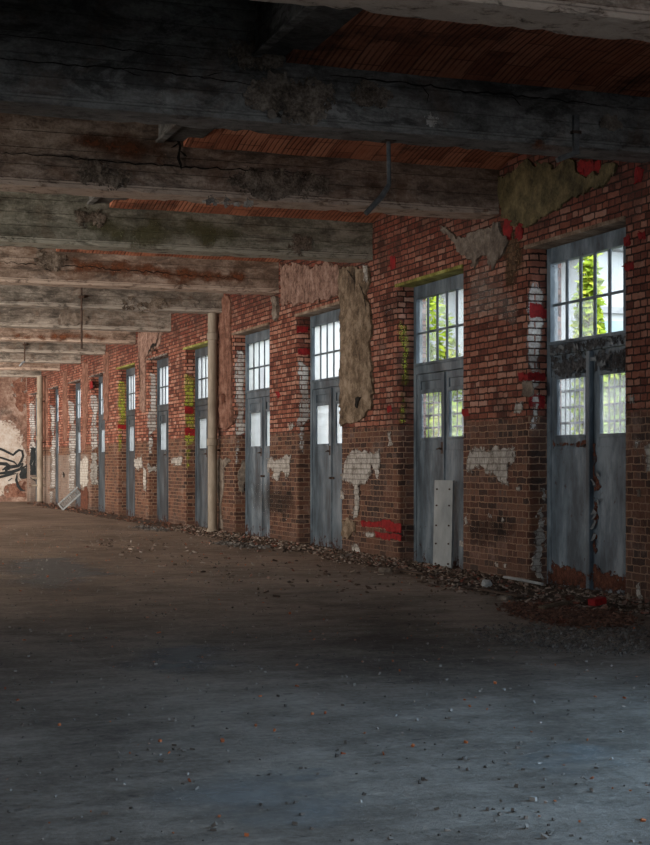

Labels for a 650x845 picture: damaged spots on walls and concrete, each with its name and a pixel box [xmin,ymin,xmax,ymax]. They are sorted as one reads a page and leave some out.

crack [330,75,601,106]
crack [0,141,326,176]
peeling [550,335,626,378]
spalling [11,377,27,412]
peeling [0,420,27,498]
peeling [466,445,516,486]
peeling [340,431,393,553]
rust [553,440,601,554]
rust [551,560,626,593]